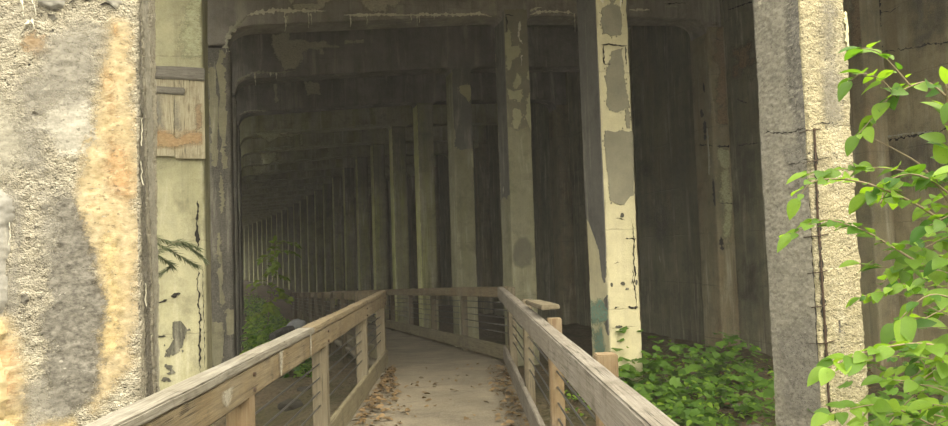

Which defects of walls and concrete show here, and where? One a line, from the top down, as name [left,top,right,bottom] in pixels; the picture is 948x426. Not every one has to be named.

corrosion [75,18,138,408]
crack [193,201,201,246]
peeling [494,8,531,201]
peeling [577,0,638,336]
crack [879,0,948,52]
crack [159,269,206,372]